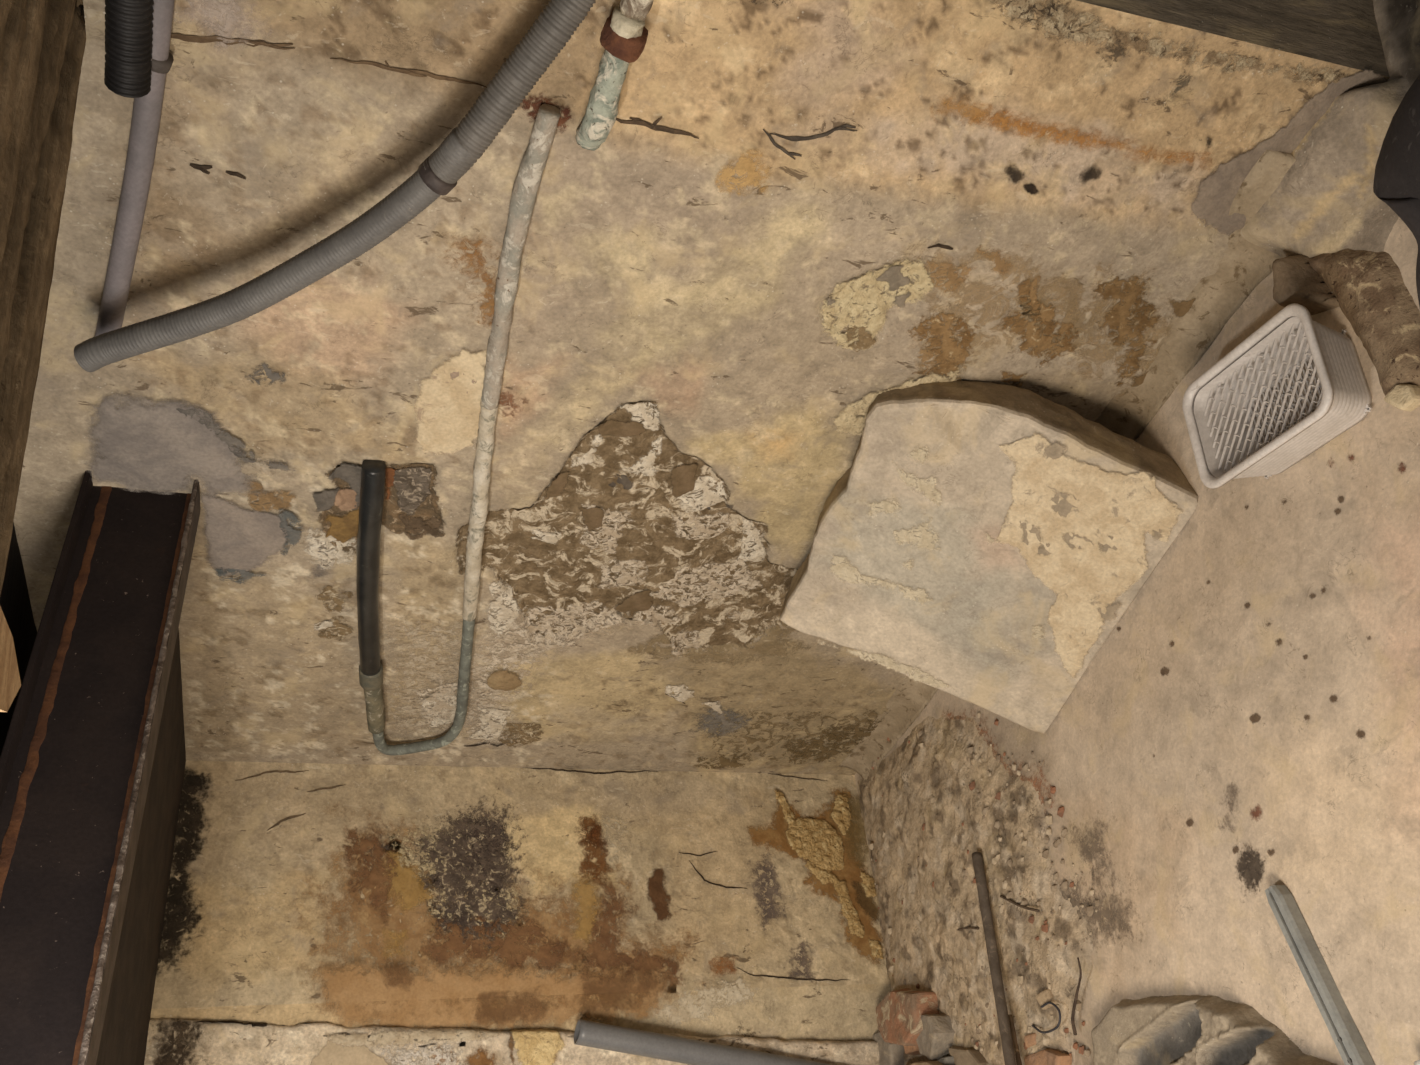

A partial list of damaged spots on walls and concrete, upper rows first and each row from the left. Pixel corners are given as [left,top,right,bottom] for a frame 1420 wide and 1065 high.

crack [171,34,295,50]
crack [330,58,487,88]
corrosion [941,102,1209,163]
peeling [820,259,934,352]
spalling [312,463,362,554]
flaking render [381,401,797,650]
damp [369,801,529,950]
peeling [325,1027,508,1048]